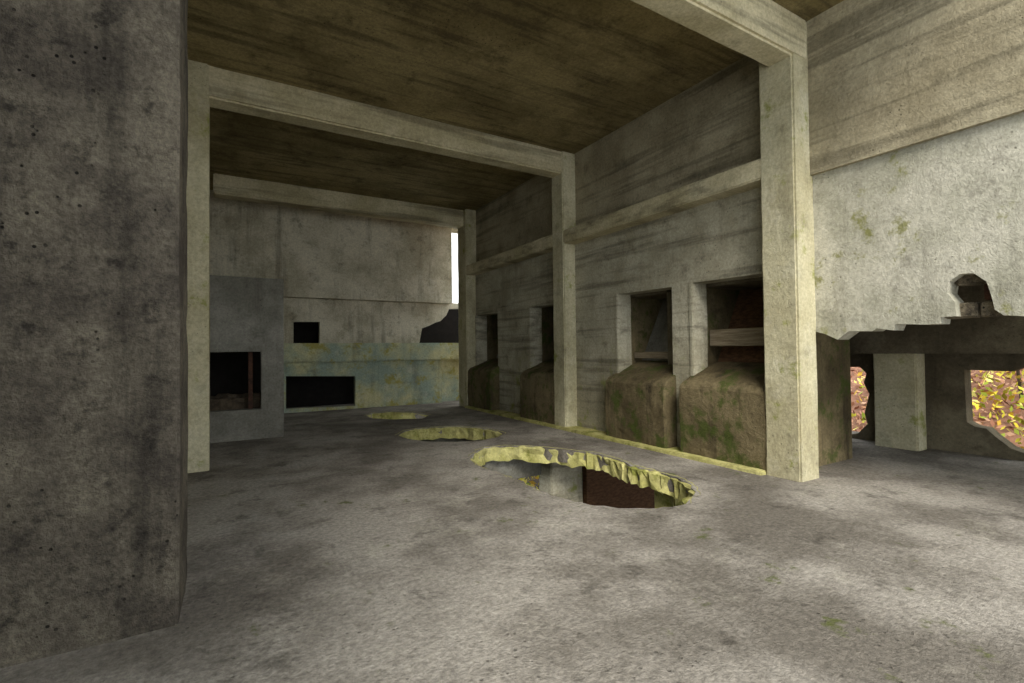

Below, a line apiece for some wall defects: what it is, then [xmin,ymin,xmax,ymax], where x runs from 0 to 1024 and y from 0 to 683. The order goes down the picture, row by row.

spalling [366,411,700,509]